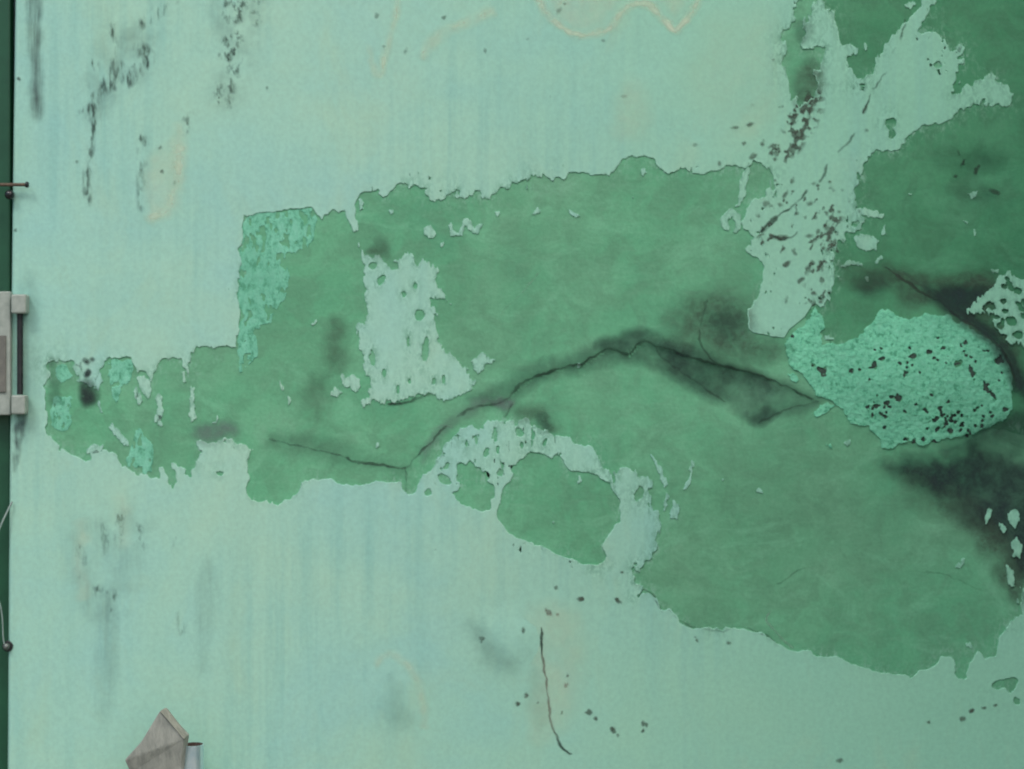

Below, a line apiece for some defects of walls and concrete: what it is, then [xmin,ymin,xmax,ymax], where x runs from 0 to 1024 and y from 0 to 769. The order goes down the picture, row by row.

peeling [805,0,1024,380]
peeling [43,156,1024,679]
leakage [900,449,1024,595]
crack [540,628,571,754]
peeling [992,677,1020,705]